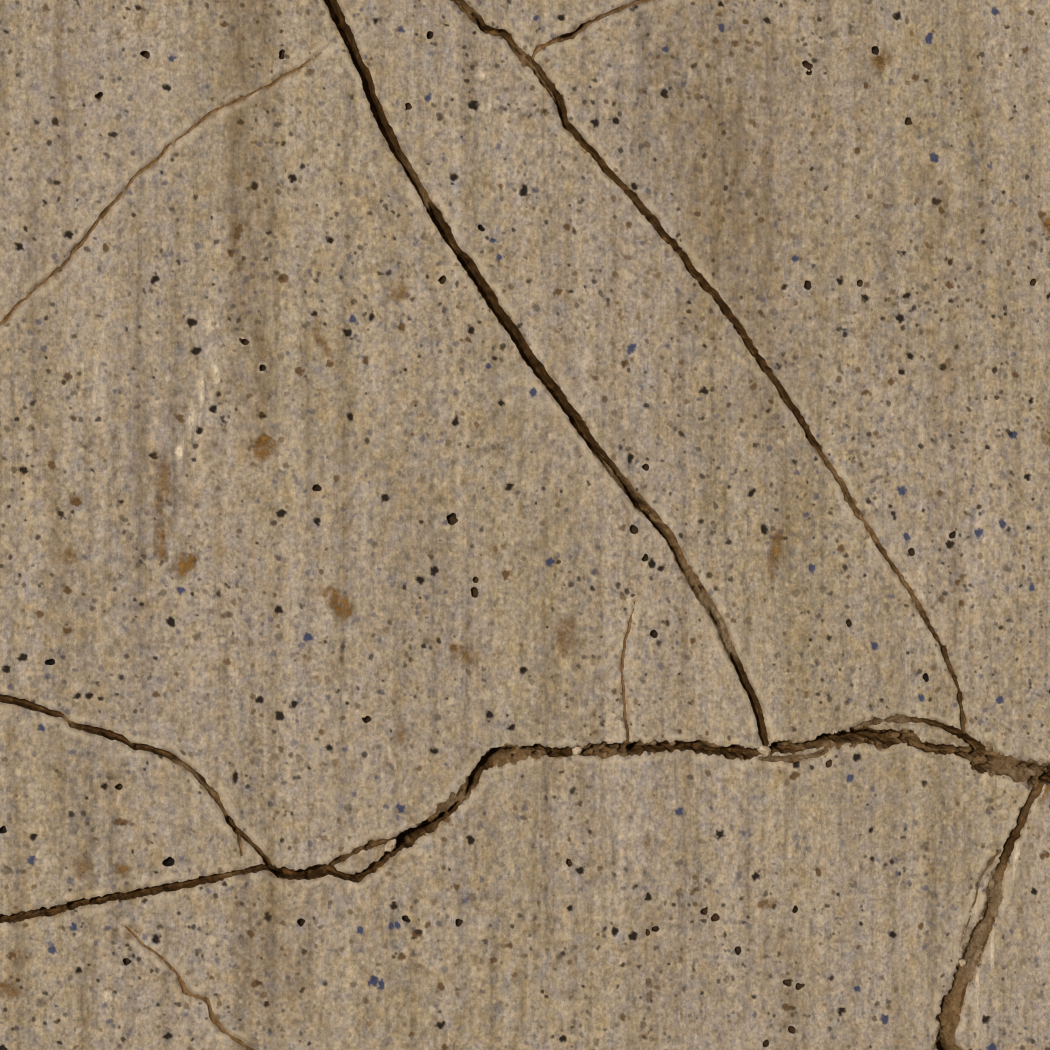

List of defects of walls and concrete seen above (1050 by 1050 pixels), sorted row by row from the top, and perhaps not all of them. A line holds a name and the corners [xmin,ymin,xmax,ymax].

crack [0,52,323,326]
crack [323,0,769,746]
crack [450,0,966,734]
crack [125,926,254,1050]
crack [0,601,1050,923]
crack [934,782,1044,1050]